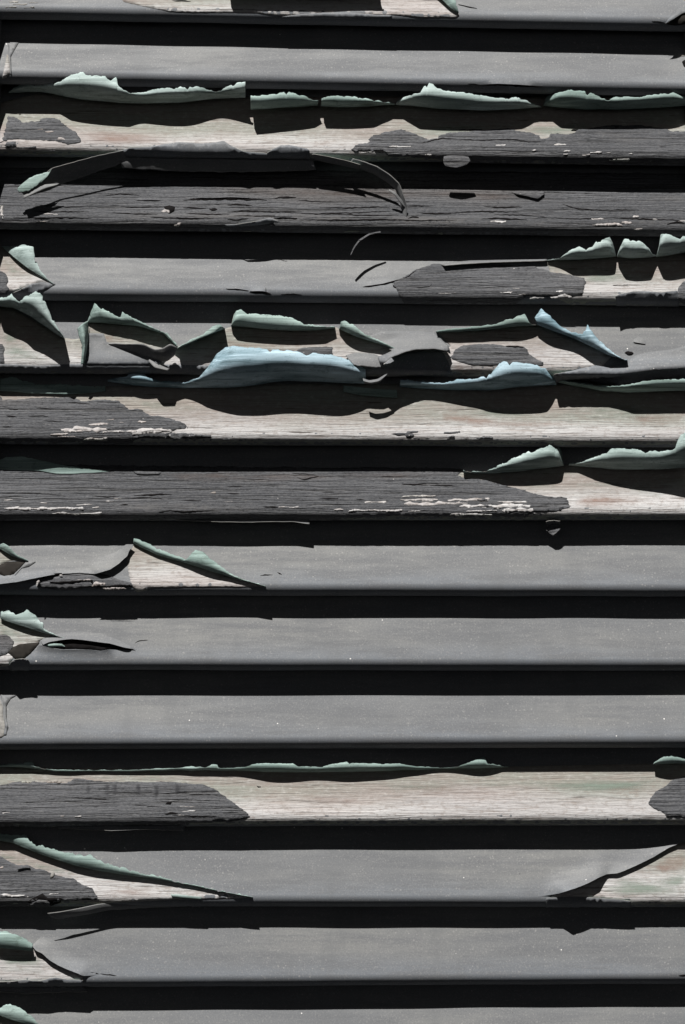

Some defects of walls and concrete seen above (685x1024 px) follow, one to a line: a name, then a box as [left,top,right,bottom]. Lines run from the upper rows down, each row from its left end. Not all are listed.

peeling [123,0,459,19]
peeling [0,41,685,536]
peeling [0,538,266,592]
peeling [0,609,136,671]
peeling [0,756,685,919]
peeling [0,931,111,1024]